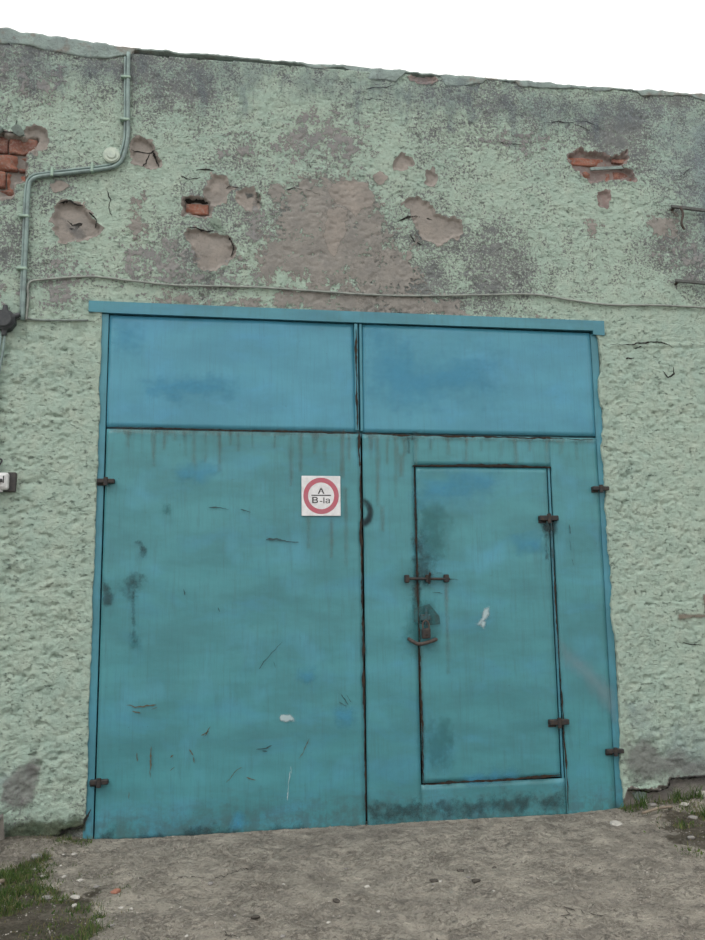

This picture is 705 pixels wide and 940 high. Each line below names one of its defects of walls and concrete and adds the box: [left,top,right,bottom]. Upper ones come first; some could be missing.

flaking render [407,75,438,85]
flaking render [478,119,638,209]
peeling [0,100,473,319]
rust [130,332,594,811]
leakage [1,763,39,807]